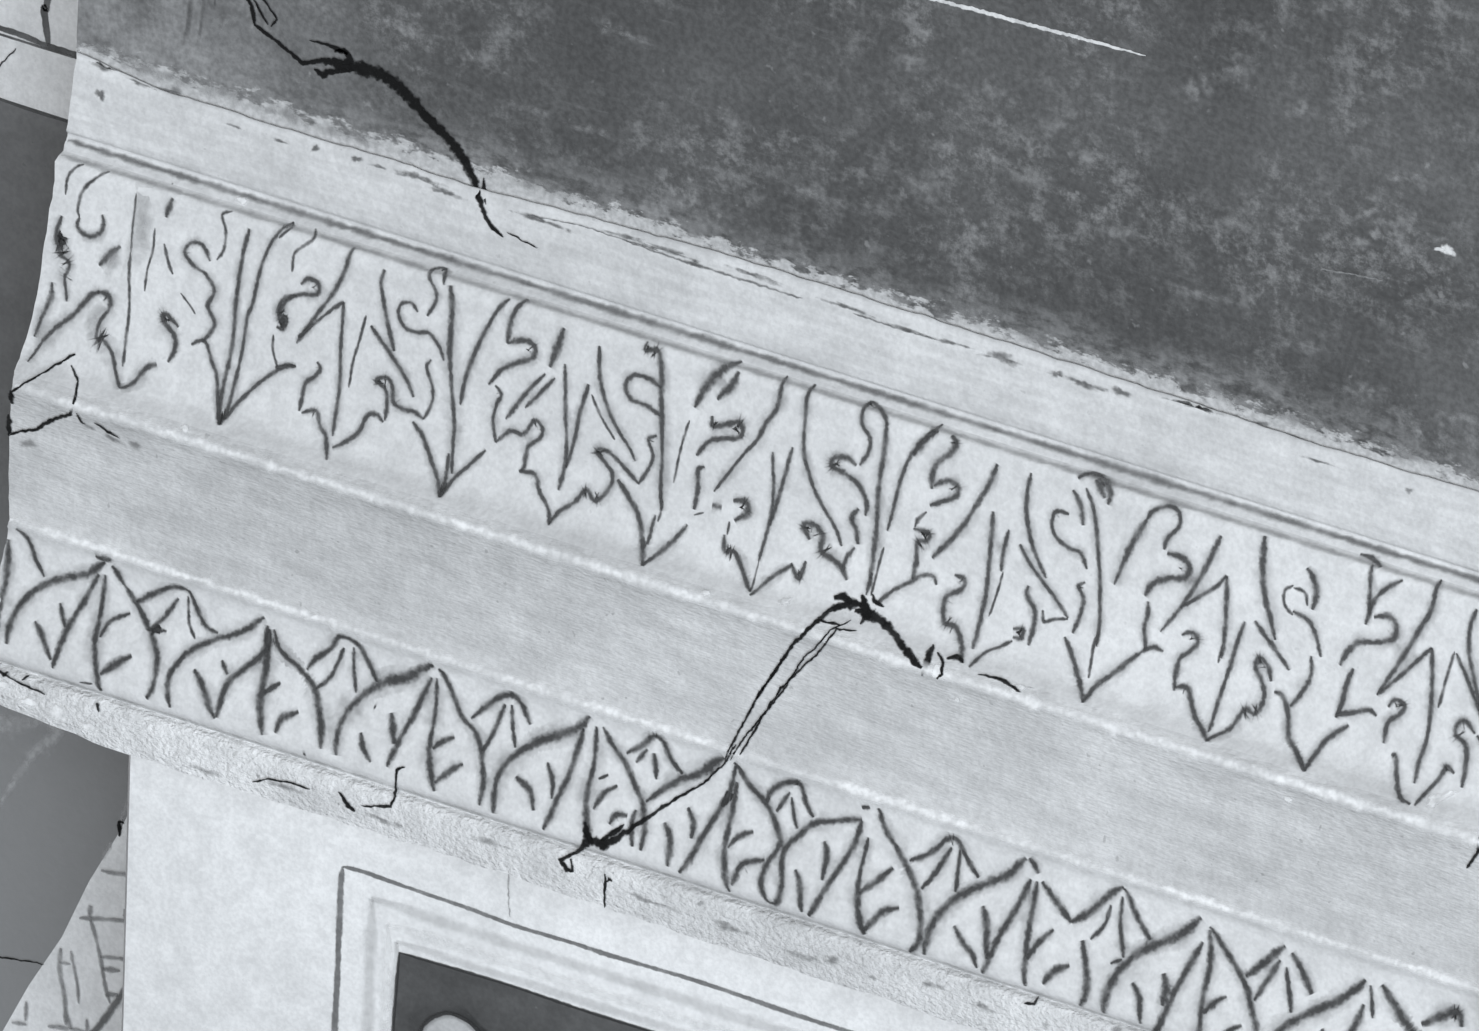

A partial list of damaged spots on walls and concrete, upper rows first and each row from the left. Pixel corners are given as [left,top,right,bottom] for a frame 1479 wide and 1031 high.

crack [246,0,536,248]
crack [6,353,120,439]
crack [558,592,1020,908]